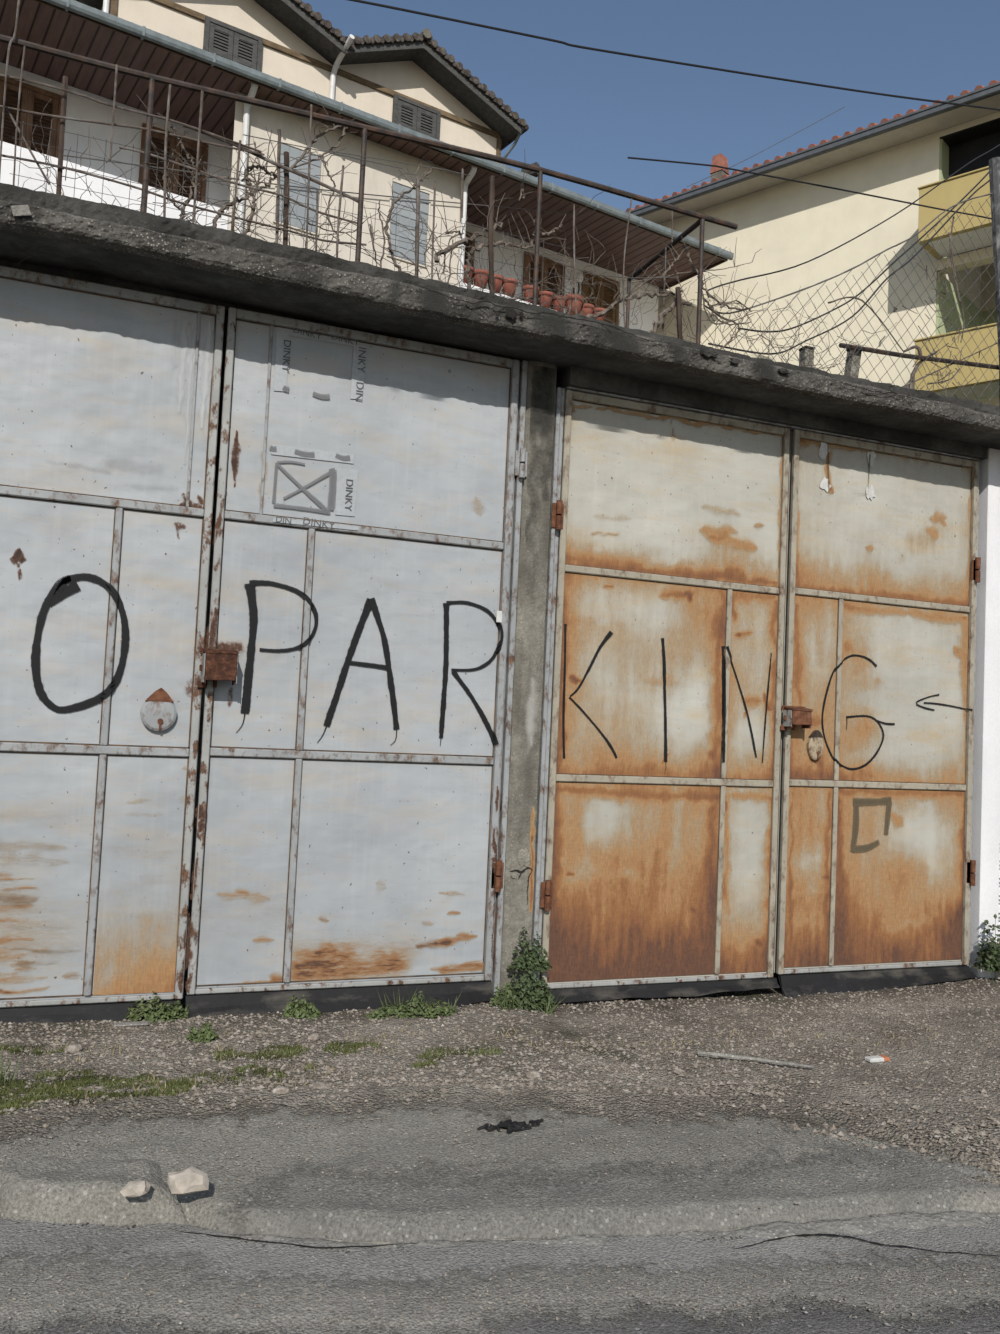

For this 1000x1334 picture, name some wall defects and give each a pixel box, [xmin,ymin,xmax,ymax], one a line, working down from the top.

corrosion [800,439,907,494]
corrosion [10,548,26,579]
corrosion [195,607,242,656]
corrosion [547,403,783,982]
corrosion [784,494,971,967]
corrosion [244,828,499,983]
corrosion [0,873,47,994]
crack [170,1228,415,1248]
crack [734,1233,998,1256]